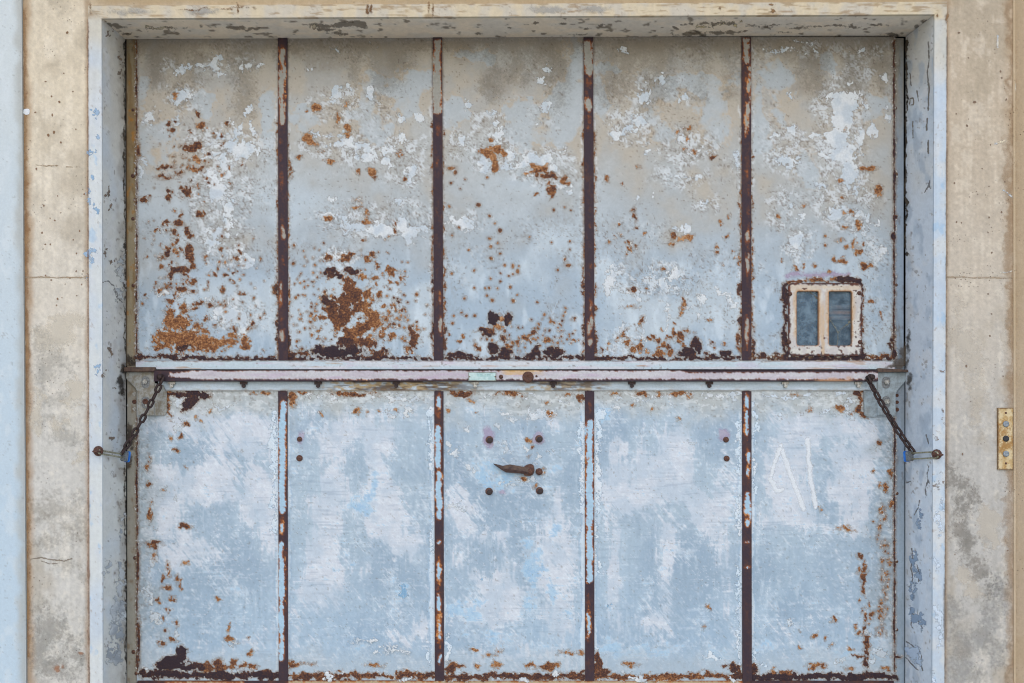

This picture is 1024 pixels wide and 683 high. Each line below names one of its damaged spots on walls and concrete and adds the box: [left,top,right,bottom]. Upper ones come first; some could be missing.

peeling [168,52,227,127]
peeling [197,104,261,270]
peeling [306,112,477,246]
rust [133,36,898,361]
peeling [472,110,574,195]
peeling [769,81,892,237]
peeling [201,296,250,338]
rust [167,391,213,454]
rust [331,391,381,415]
rust [631,391,693,411]
rust [835,391,869,419]
rust [134,417,904,683]